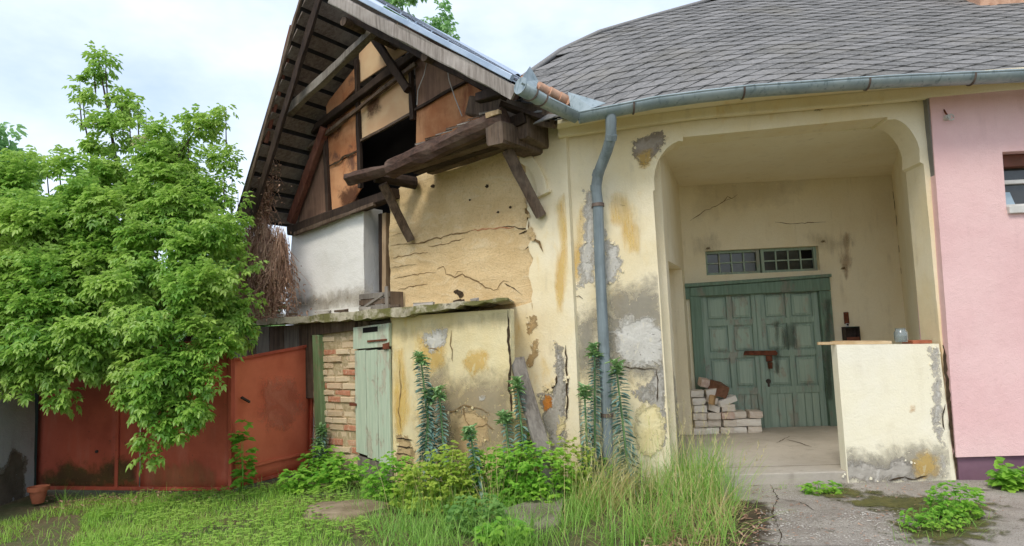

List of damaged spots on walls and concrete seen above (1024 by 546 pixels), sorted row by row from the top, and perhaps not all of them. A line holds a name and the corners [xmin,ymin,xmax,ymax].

flaking render [632,130,669,165]
peeling [576,190,624,290]
peeling [422,328,448,354]
leakage [420,340,510,464]
crack [414,199,543,430]
flaking render [526,315,539,367]
peeling [537,341,569,454]
peeling [609,312,668,452]
peeling [927,346,946,478]
crack [771,483,819,544]
leakage [847,448,947,482]